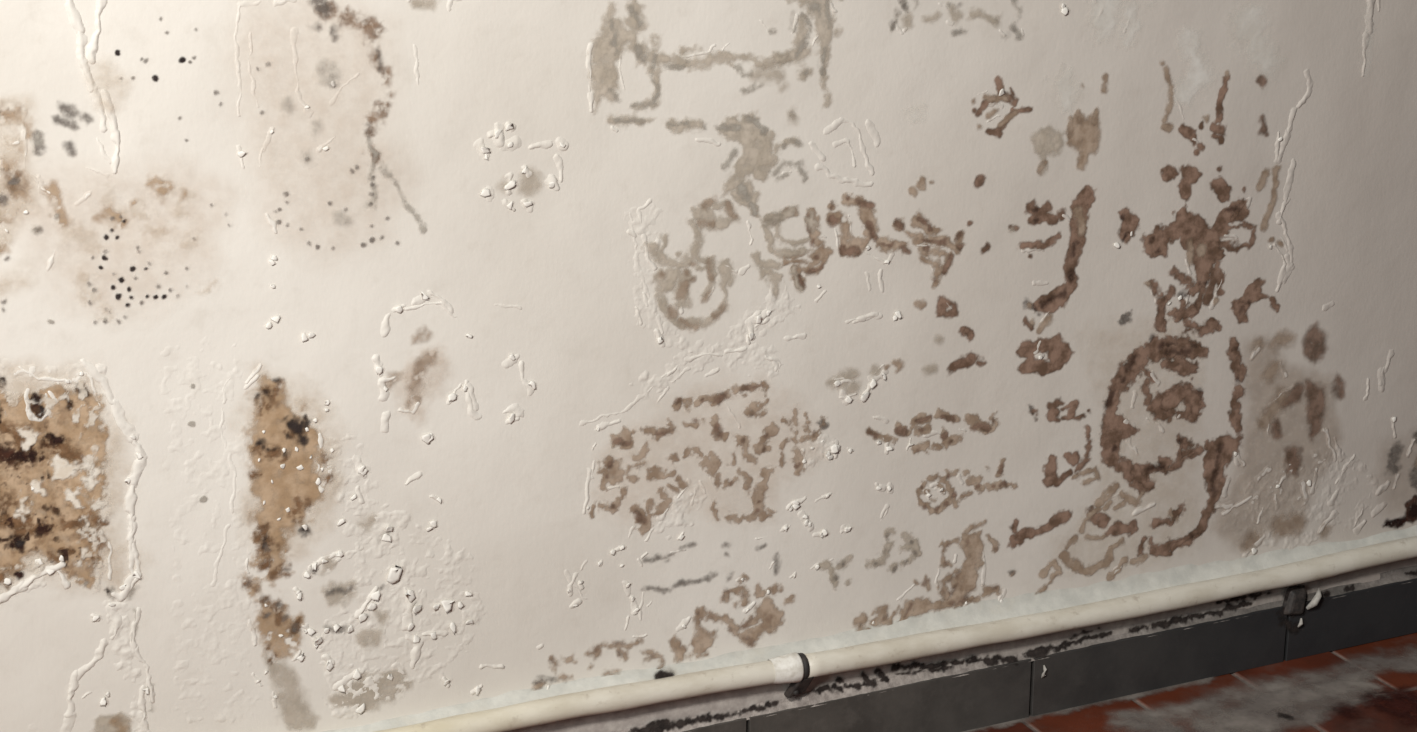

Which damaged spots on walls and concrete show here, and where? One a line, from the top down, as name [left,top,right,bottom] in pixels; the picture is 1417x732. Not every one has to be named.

damp [0,105,92,233]
damp [214,0,389,169]
damp [350,103,398,205]
damp [88,201,171,323]
peeling [534,0,998,690]
flaking render [854,62,1295,631]
flaking render [0,358,155,732]